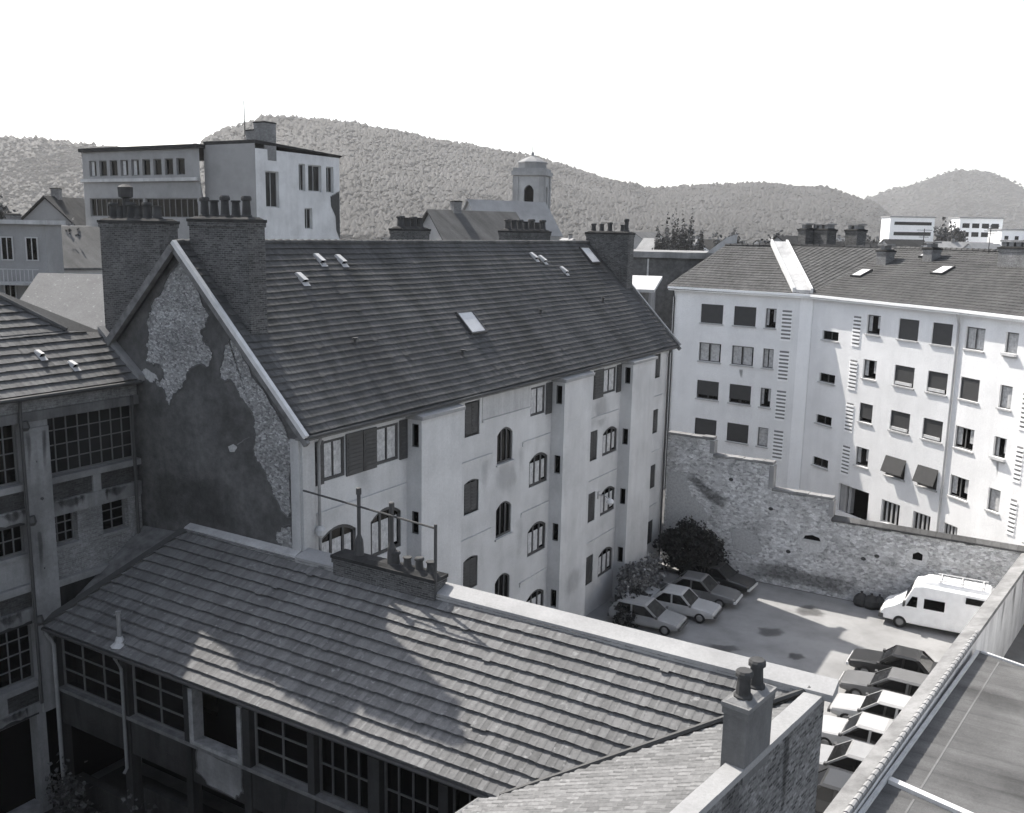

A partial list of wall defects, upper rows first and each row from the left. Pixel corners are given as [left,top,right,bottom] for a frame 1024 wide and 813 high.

flaking render [142,261,292,548]